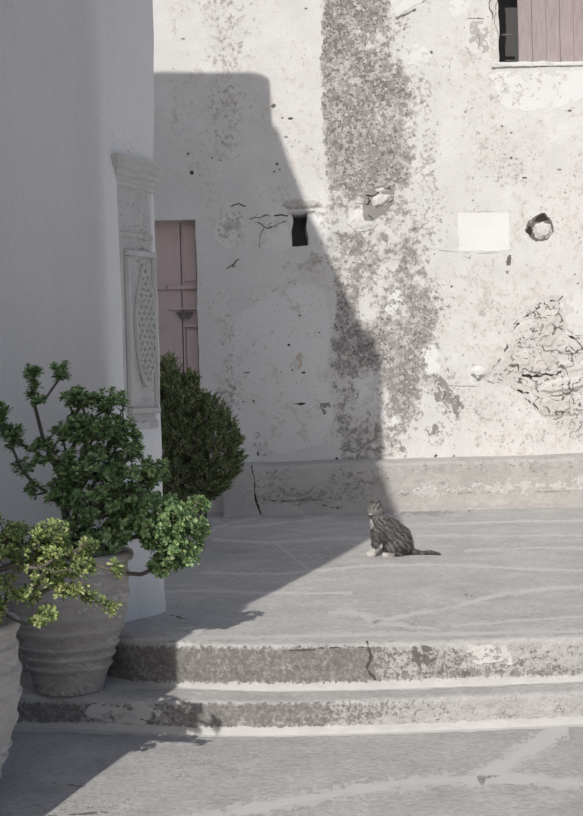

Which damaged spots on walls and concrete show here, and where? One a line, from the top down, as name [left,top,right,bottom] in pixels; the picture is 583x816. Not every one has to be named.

flaking render [393,0,422,16]
crack [468,0,499,49]
crack [230,203,307,248]
spalling [362,185,395,221]
flaking render [525,213,554,242]
crack [439,295,583,438]
crack [251,466,342,515]
leakage [107,510,583,685]
crack [289,641,376,680]